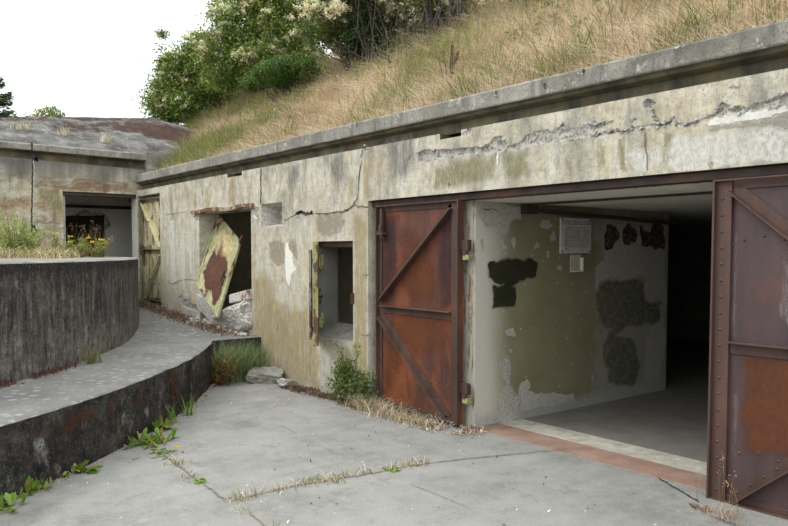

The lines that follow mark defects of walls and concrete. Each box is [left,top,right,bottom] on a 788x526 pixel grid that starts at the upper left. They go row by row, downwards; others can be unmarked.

spalling [407,117,614,162]
flaking render [628,90,788,172]
crack [287,161,369,220]
corrosion [203,245,228,305]
peeling [595,222,667,389]
peeling [499,349,574,422]